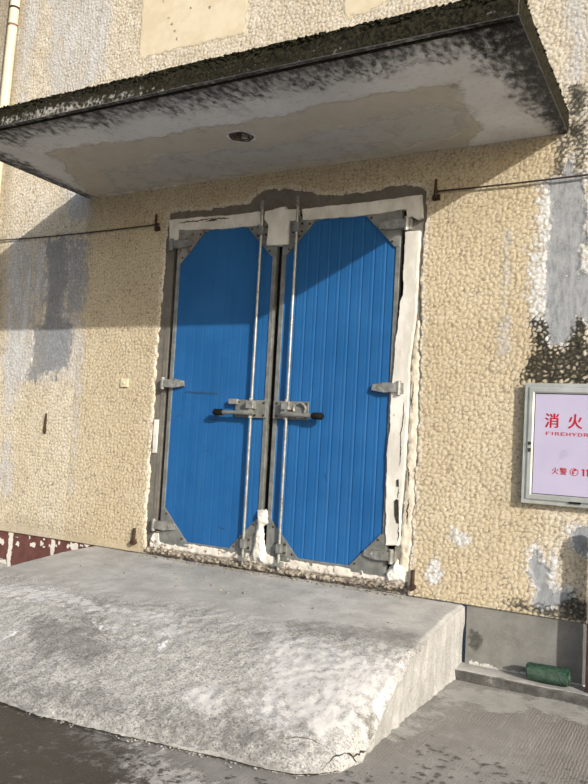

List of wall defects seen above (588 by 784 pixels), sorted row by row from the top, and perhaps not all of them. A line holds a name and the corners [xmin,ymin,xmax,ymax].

water stain [0,0,588,219]
crack [180,216,229,224]
peeling [523,152,588,348]
peeling [20,233,93,385]
water stain [514,316,588,386]
peeling [0,532,19,569]
peeling [29,536,89,555]
peeling [522,544,575,611]
peeling [565,522,588,558]
crack [0,702,368,775]